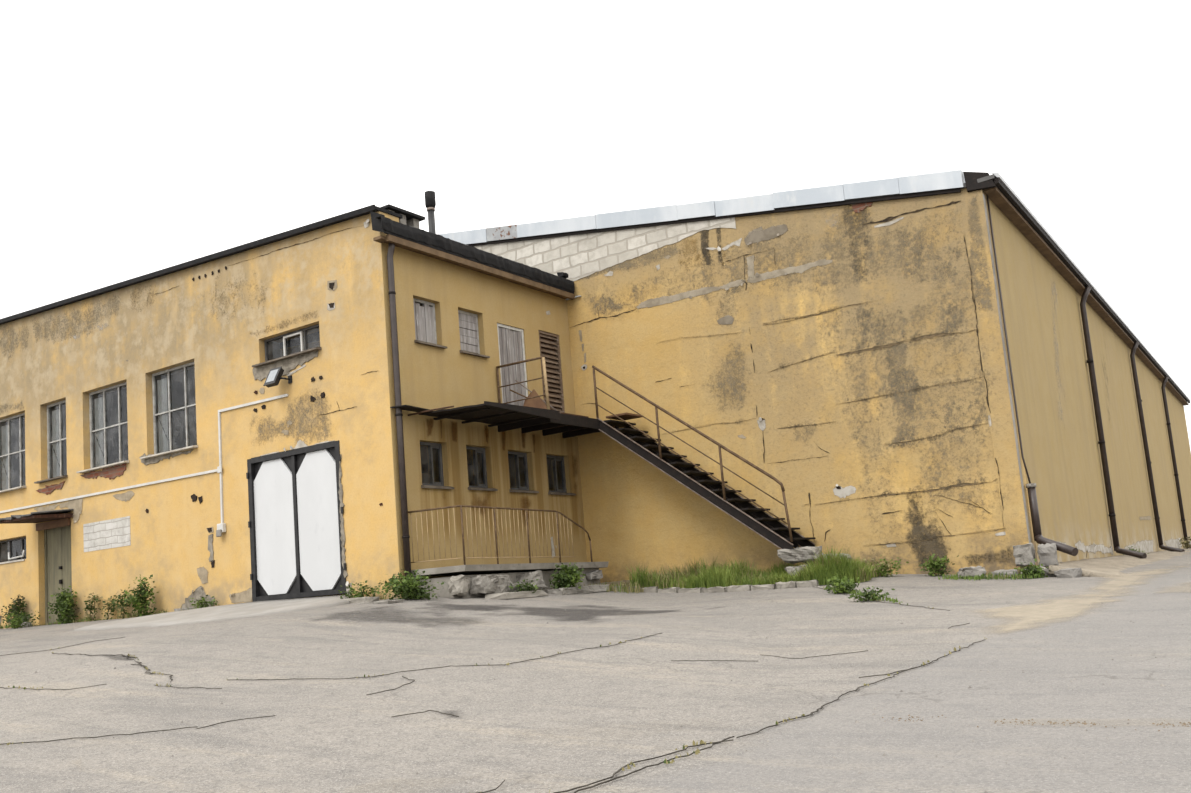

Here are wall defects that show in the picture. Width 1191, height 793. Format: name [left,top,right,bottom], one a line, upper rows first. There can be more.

crack [866,201,961,224]
water stain [585,228,805,300]
spalling [637,224,832,309]
crack [573,303,636,327]
crack [656,238,991,463]
water stain [817,198,992,446]
water stain [258,392,328,440]
crack [805,458,1006,545]
water stain [907,496,948,572]